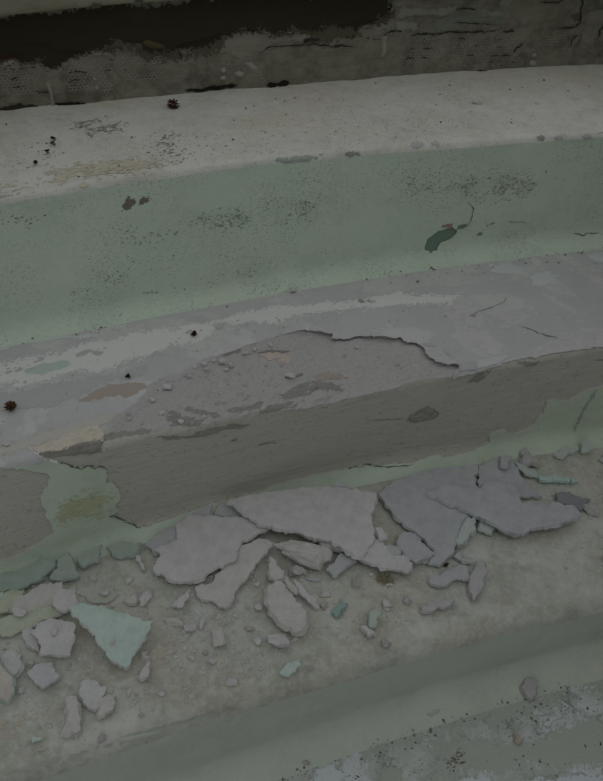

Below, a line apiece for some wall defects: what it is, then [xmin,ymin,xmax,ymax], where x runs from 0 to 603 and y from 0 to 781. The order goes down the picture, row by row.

crack [261,8,523,71]
crack [542,0,603,47]
peeling [425,224,468,254]
peeling [0,467,54,560]
peeling [28,330,603,610]
peeling [0,552,152,704]